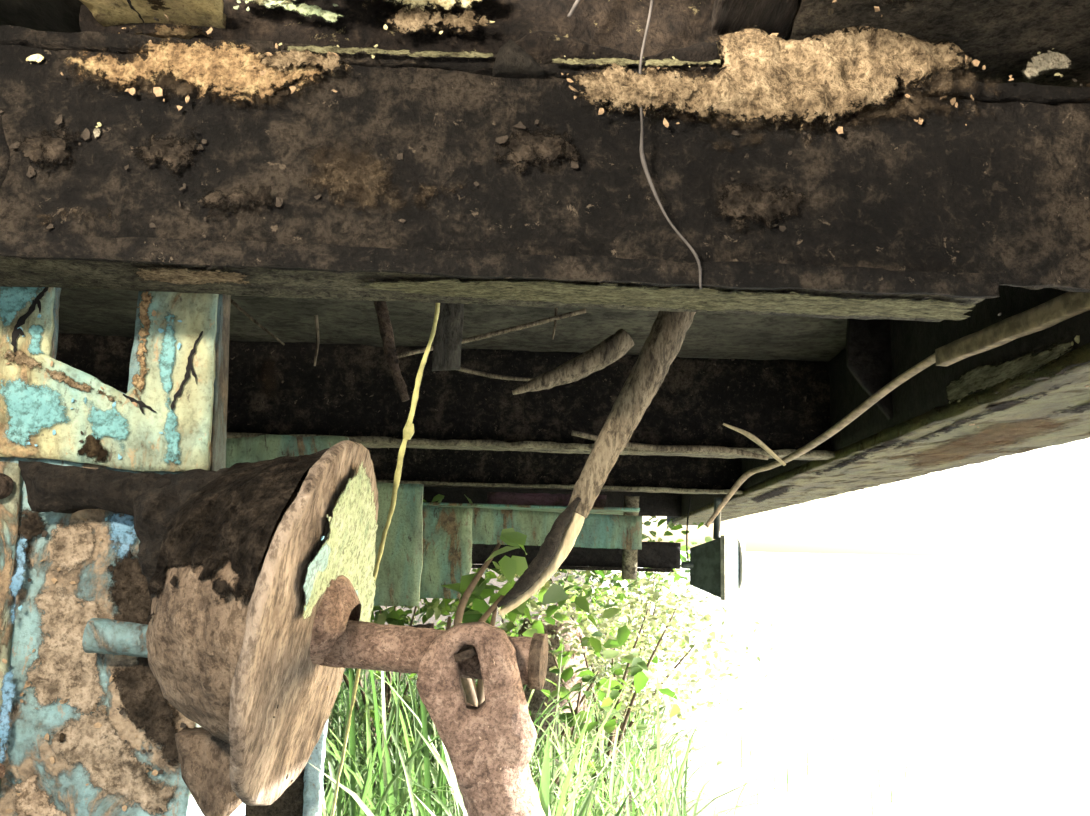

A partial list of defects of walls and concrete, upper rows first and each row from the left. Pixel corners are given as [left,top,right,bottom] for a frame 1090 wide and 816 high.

crack [127,0,145,25]
peeling [233,0,341,22]
peeling [278,43,494,59]
peeling [384,0,495,35]
peeling [0,286,45,355]
crack [11,287,49,356]
peeling [0,378,129,460]
crack [123,331,203,414]
peeling [158,313,182,464]
peeling [105,513,137,559]